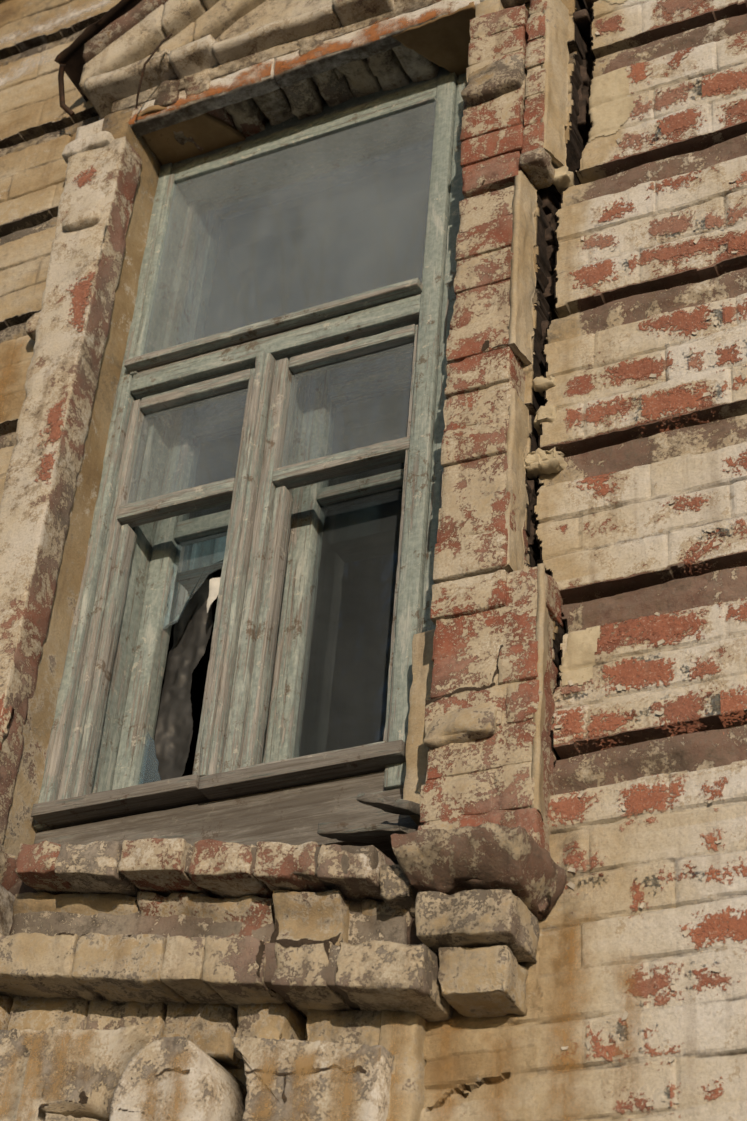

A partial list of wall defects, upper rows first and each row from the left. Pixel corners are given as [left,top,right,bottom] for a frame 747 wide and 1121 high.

peeling [611,46,747,149]
peeling [564,169,747,294]
peeling [66,271,95,332]
crack [447,0,596,577]
peeling [563,298,747,438]
peeling [34,392,67,485]
peeling [662,492,712,514]
peeling [721,449,747,481]
crack [549,612,568,767]
peeling [553,598,747,754]
peeling [547,773,729,832]
peeling [627,827,747,918]